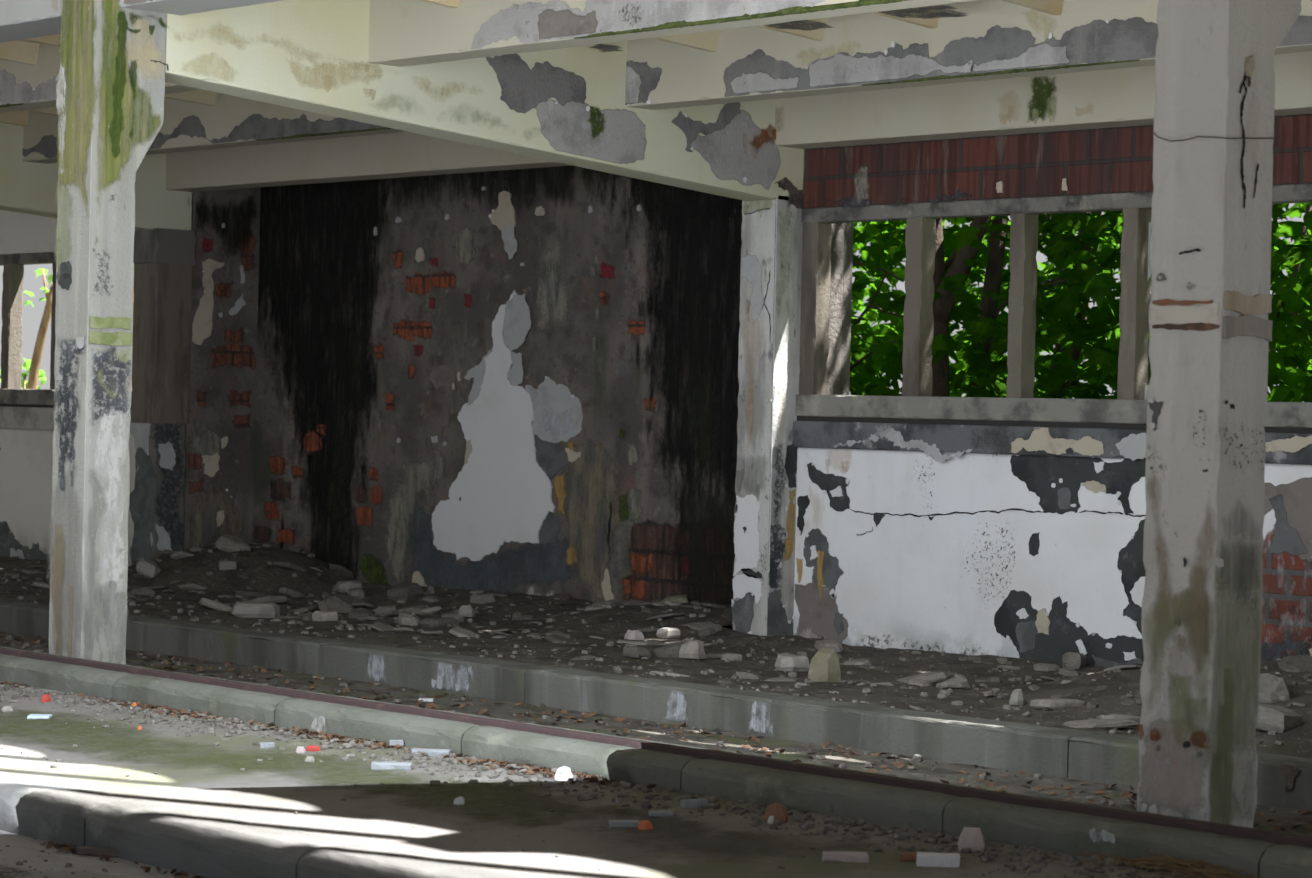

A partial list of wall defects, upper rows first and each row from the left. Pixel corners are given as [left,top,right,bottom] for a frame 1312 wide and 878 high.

peeling [880,5,967,19]
peeling [1277,15,1312,47]
peeling [470,0,832,164]
crack [1239,72,1259,208]
peeling [622,17,1158,668]
peeling [0,521,51,562]
crack [850,508,1045,535]
crack [1078,509,1146,517]
flaking render [1261,477,1312,661]